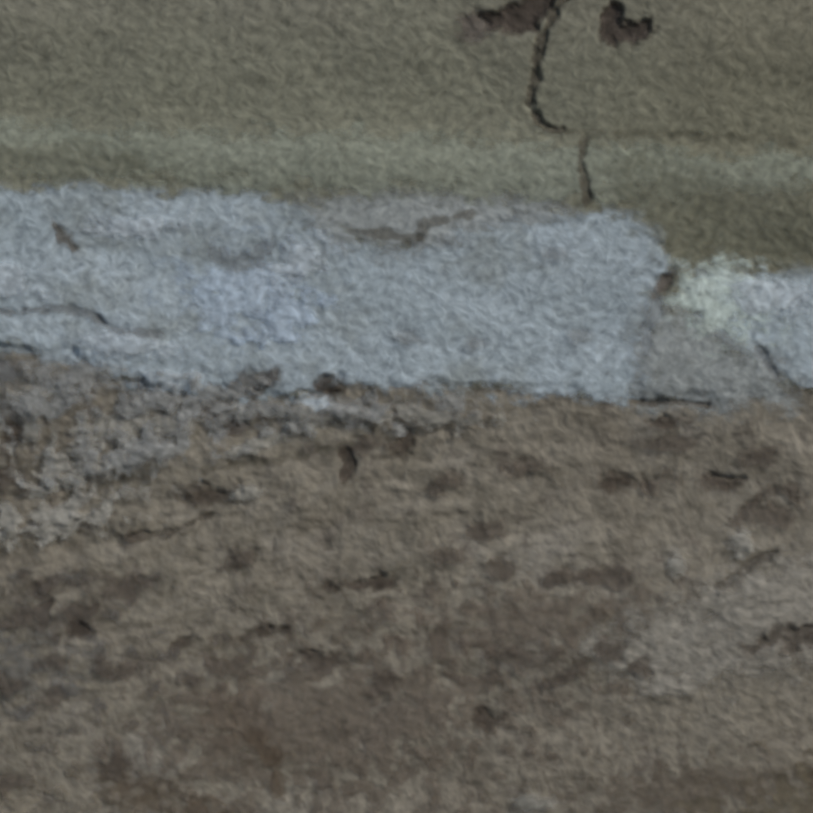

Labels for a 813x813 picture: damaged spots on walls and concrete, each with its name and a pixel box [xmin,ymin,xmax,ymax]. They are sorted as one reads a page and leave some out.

spalling [458,0,555,41]
spalling [599,2,651,47]
crack [527,0,568,132]
crack [579,140,592,205]
spalling [0,179,813,813]